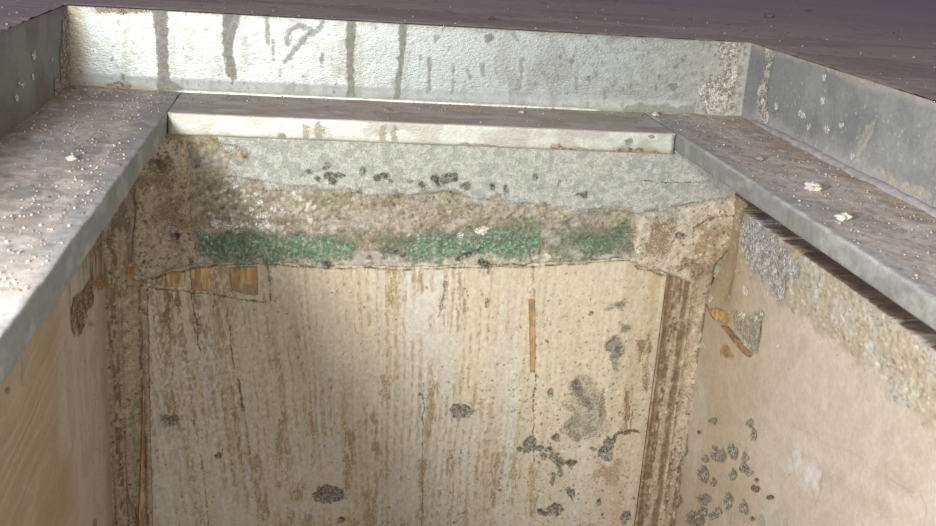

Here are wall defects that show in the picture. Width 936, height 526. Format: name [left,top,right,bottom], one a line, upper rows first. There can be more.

water stain [153,10,182,90]
water stain [222,14,239,84]
water stain [265,16,324,63]
water stain [345,21,356,97]
water stain [394,24,407,99]
peeling [213,134,736,215]
spalling [455,248,491,268]
peeling [739,207,800,301]
water stain [637,335,653,392]